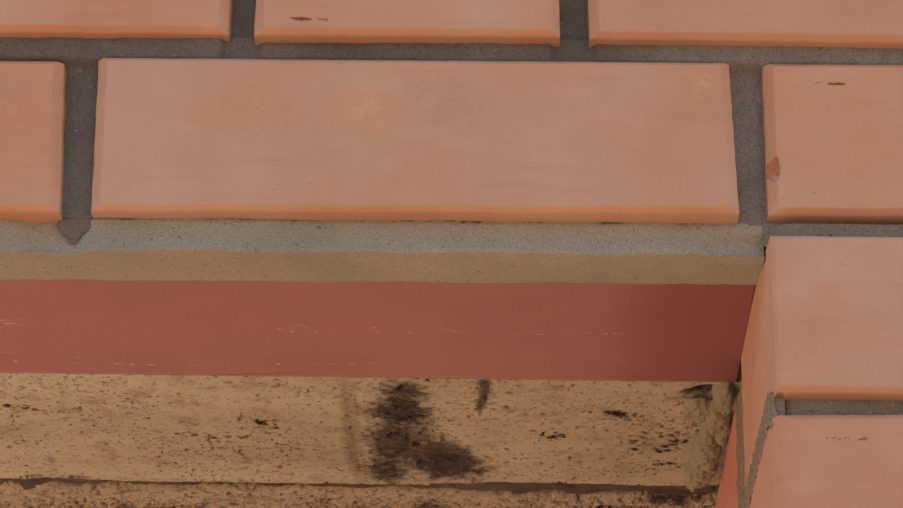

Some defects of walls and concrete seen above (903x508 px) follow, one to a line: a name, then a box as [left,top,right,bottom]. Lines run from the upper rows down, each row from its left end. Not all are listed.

spalling [766,157,780,181]
water stain [361,380,494,484]